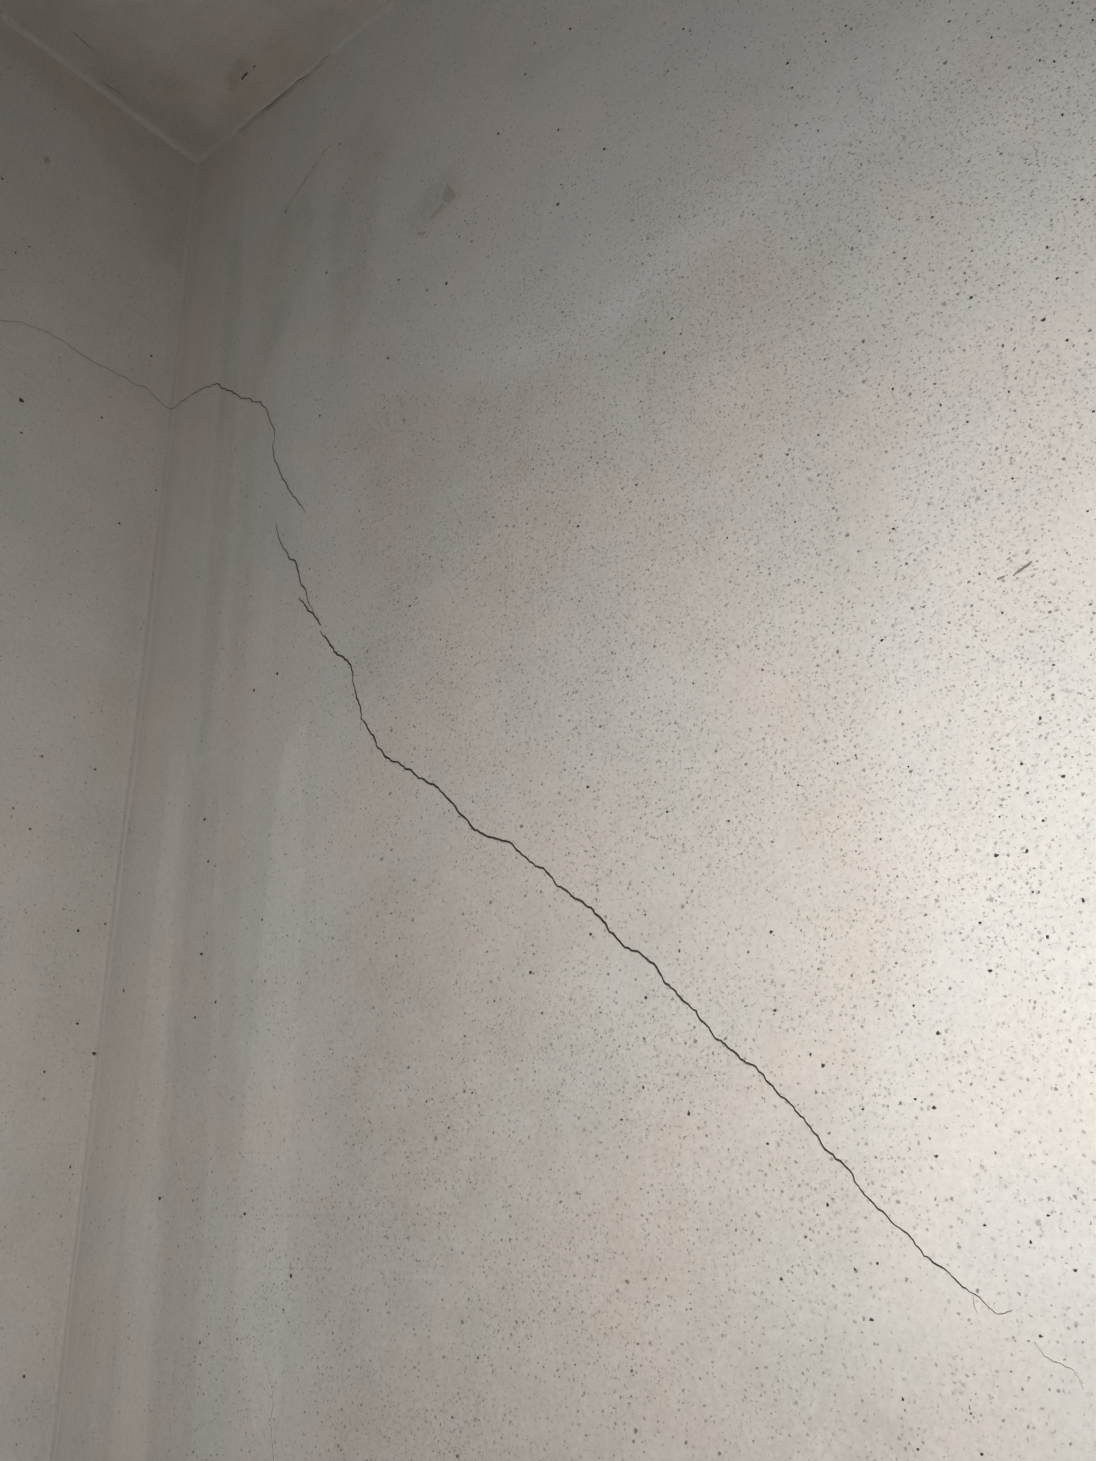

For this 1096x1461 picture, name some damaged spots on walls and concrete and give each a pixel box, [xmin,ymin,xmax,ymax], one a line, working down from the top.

crack [0,320,1012,1315]
crack [1034,1340,1084,1389]